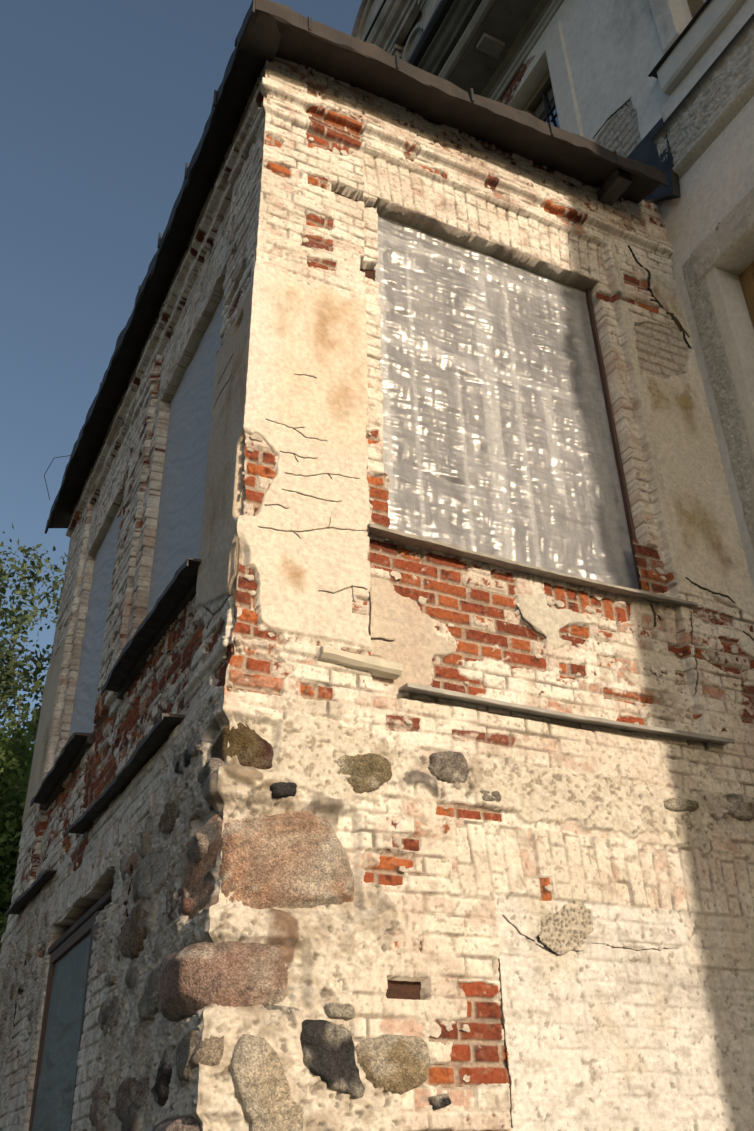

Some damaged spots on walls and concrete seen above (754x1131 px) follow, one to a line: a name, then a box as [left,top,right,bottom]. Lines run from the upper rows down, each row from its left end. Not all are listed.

spalling [306,105,367,157]
peeling [596,101,641,158]
crack [628,245,691,349]
spalling [242,433,278,516]
crack [204,419,369,629]
spalling [367,473,630,697]
spalling [633,540,681,593]
spalling [668,606,754,725]
flaking render [385,714,420,732]
flaking render [603,688,654,732]
crack [502,915,677,953]
crack [498,959,513,1128]